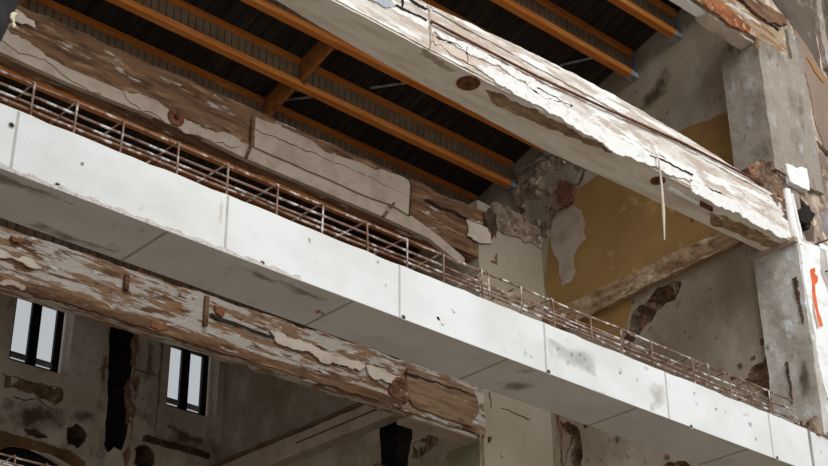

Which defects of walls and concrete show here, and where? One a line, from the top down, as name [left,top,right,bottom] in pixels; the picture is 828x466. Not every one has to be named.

crack [395,0,468,64]
peeling [422,31,788,247]
spalling [497,152,587,286]
spalling [624,281,681,343]
spalling [4,374,63,406]
spalling [122,333,140,466]
crack [557,417,577,466]
spalling [664,455,691,466]